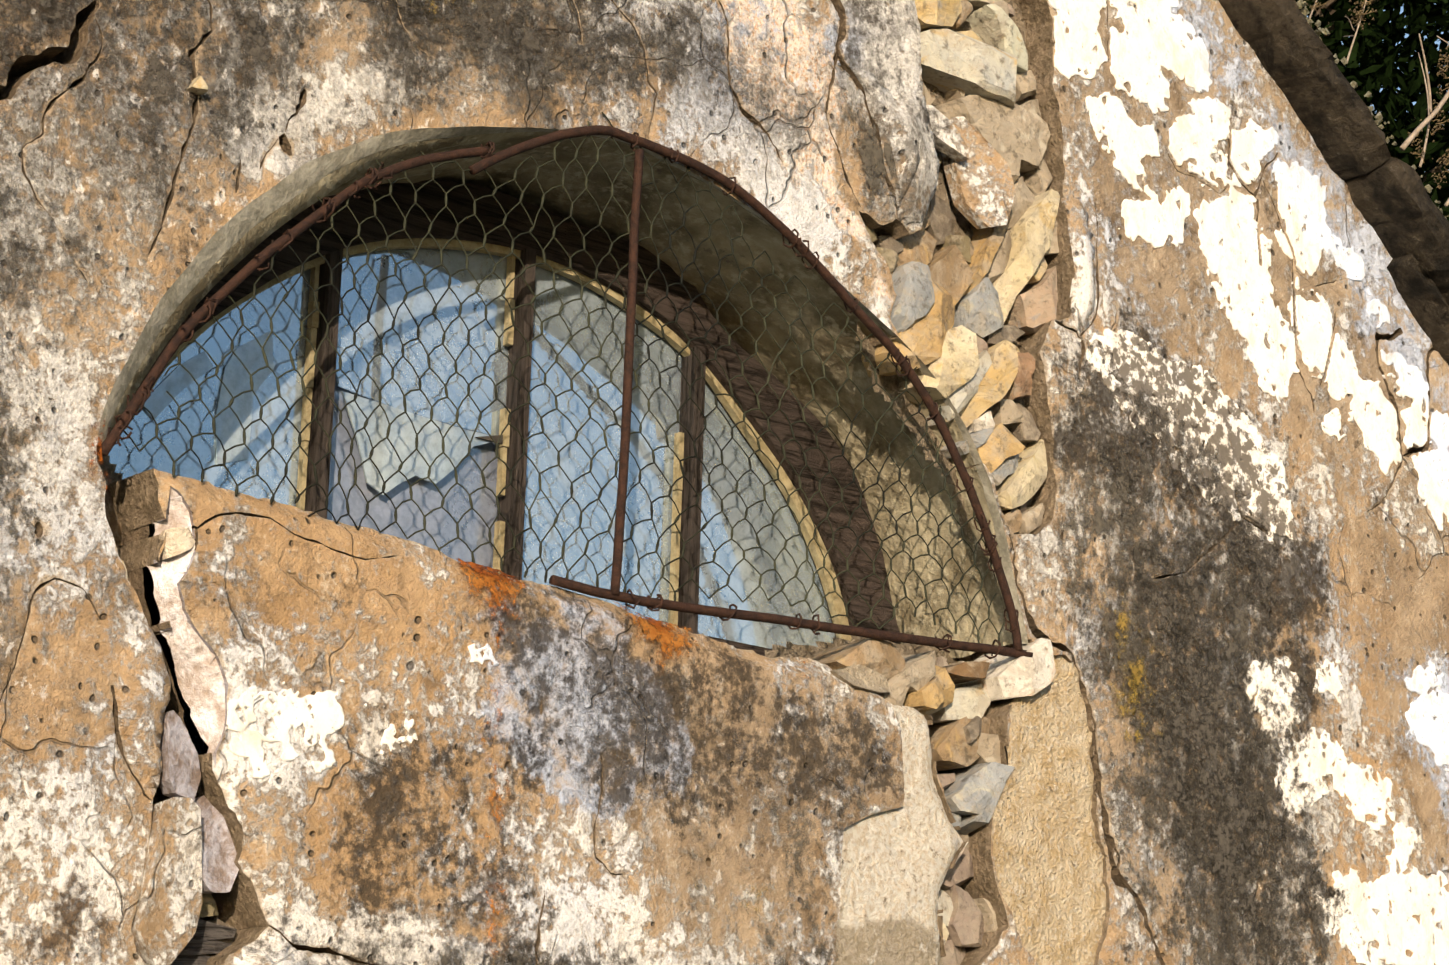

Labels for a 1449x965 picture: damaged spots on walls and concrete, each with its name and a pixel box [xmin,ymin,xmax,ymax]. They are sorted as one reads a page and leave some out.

crack [0,0,103,285]
leakage [0,0,323,200]
leakage [352,0,723,126]
spalling [855,0,1449,551]
crack [1367,328,1434,512]
spalling [96,444,345,965]
corrosion [457,558,527,660]
corrosion [483,709,510,839]
corrosion [614,601,699,667]
crack [996,534,1165,965]
leakage [1043,342,1359,965]
peeling [1243,656,1449,965]